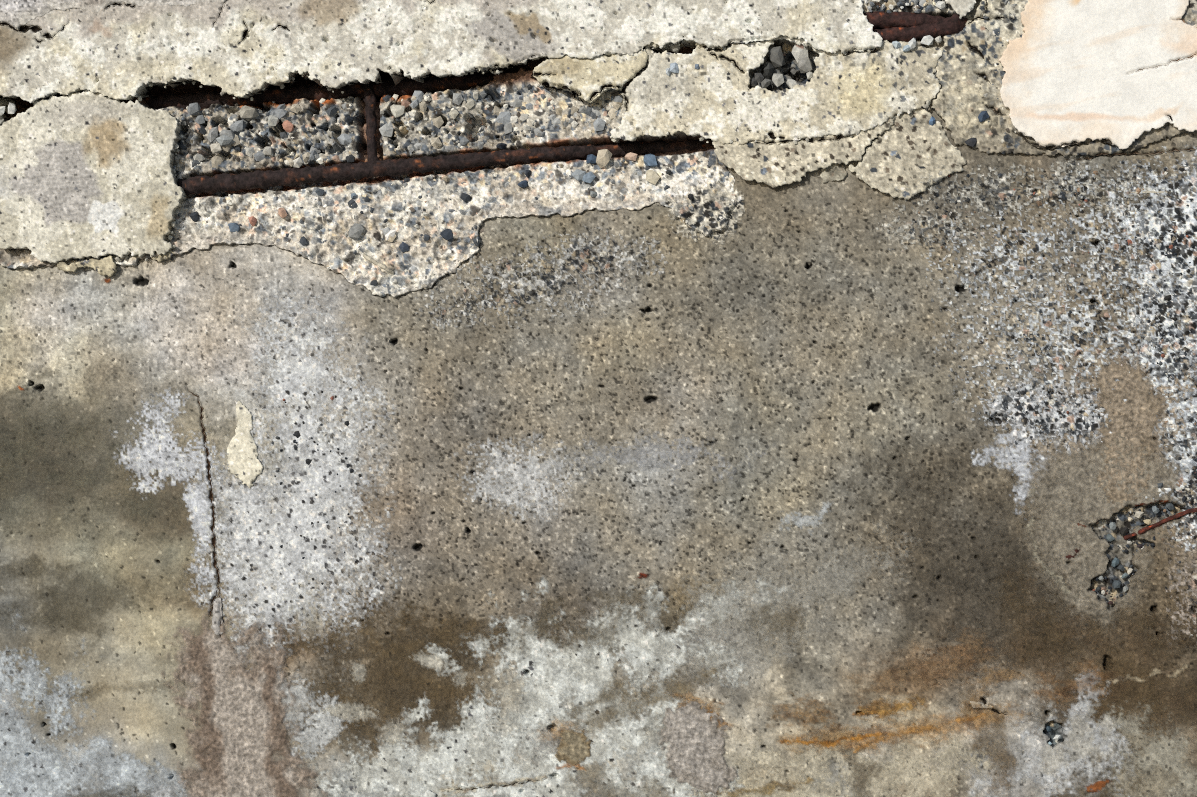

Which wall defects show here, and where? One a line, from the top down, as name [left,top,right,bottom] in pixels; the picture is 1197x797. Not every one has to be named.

crack [0,22,69,43]
corrosion [864,11,969,42]
peeling [1182,0,1197,26]
corrosion [128,68,714,195]
spalling [0,0,1189,298]
crack [189,391,223,636]
damp [114,291,1197,797]
damp [0,649,186,797]
corrosion [781,733,895,753]
corrosion [855,698,924,718]